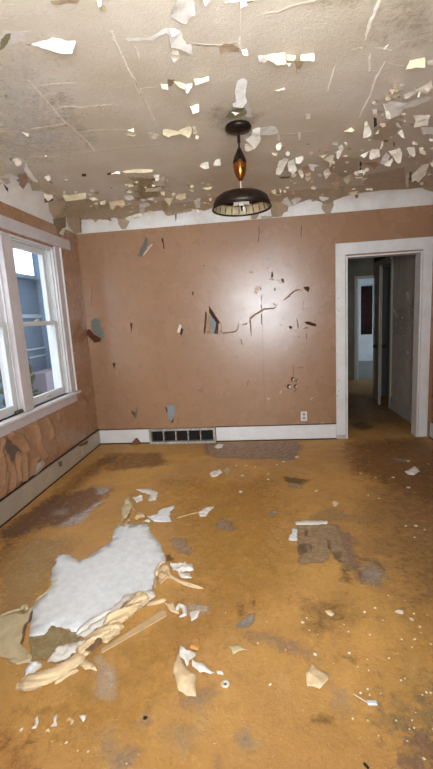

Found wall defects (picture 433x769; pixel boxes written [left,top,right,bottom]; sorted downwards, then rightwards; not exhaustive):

peeling [0,30,76,54]
peeling [126,0,210,64]
peeling [258,52,315,73]
peeling [387,57,433,70]
peeling [161,76,209,93]
peeling [234,80,433,219]
peeling [0,157,221,235]
flaking render [5,436,22,462]